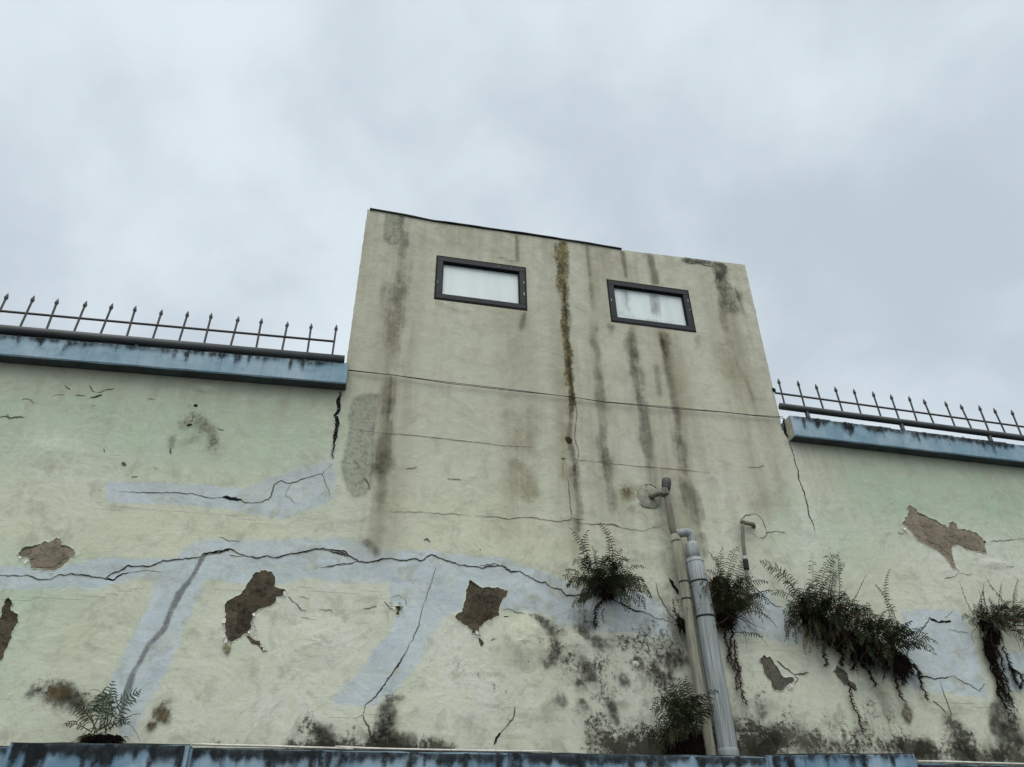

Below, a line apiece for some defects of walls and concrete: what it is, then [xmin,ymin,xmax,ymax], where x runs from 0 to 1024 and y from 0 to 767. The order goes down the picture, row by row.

leakage [684,258,726,279]
leakage [555,241,575,410]
crack [103,391,527,503]
crack [783,419,816,533]
flaking render [902,505,987,570]
flaking render [0,597,20,662]
flaking render [222,569,287,651]
crack [0,537,679,744]
flaking render [454,580,509,647]
mould [631,648,687,679]
crack [906,610,985,741]
leakage [0,697,1024,767]